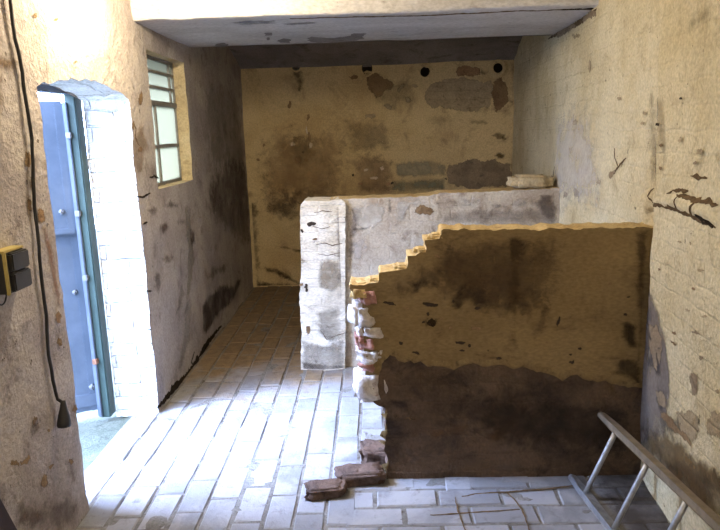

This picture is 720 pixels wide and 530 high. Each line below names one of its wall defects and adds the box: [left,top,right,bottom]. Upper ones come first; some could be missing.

flaking render [351,63,511,112]
flaking render [352,153,512,190]
crack [609,148,627,179]
flaking render [398,201,434,216]
crack [647,173,718,228]
peeling [320,261,338,289]
leakage [437,241,540,310]
leakage [203,280,240,333]
leakage [623,323,635,346]
flaking render [303,282,720,502]